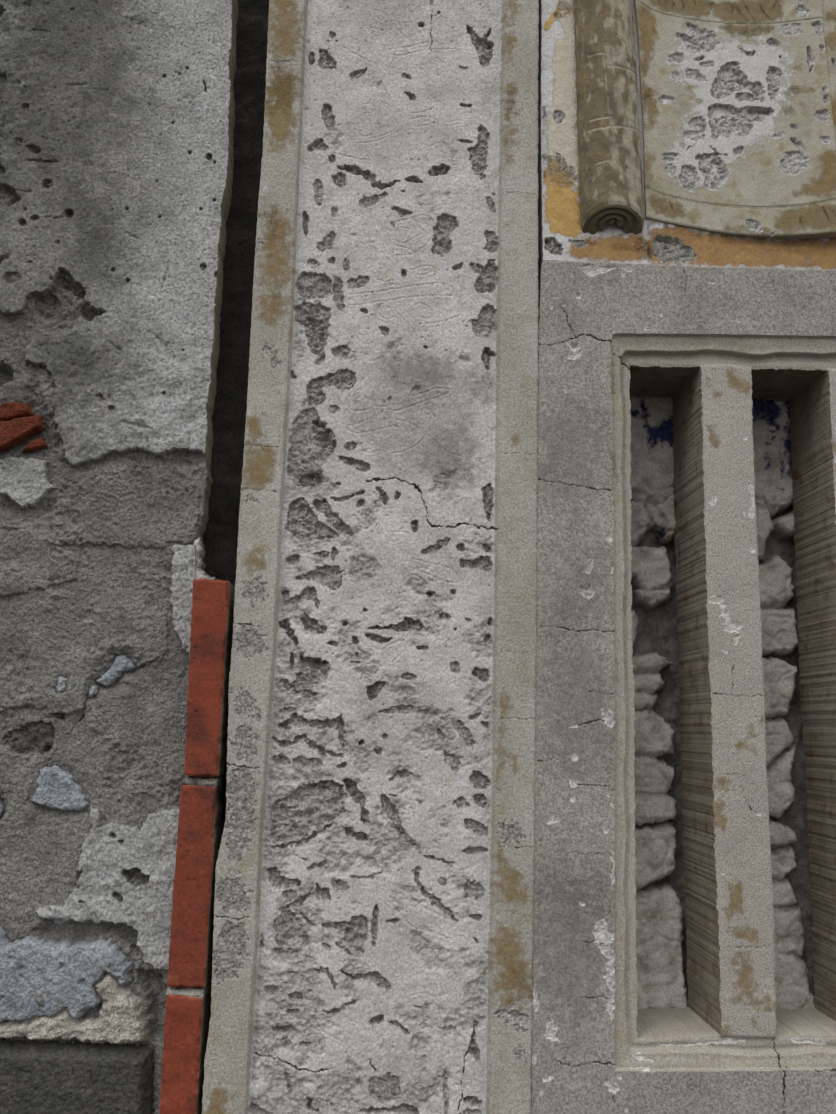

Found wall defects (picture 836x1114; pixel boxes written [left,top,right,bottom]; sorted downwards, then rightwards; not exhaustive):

leakage [264,0,299,141]
peeling [544,0,579,186]
peeling [651,0,836,192]
leakage [255,210,290,322]
crack [540,316,630,370]
crack [366,478,421,493]
crack [427,520,498,530]
spalling [0,712,65,756]
spalling [112,867,150,903]
leakage [729,884,742,916]
leakage [491,929,526,1004]
spalling [592,916,618,1020]